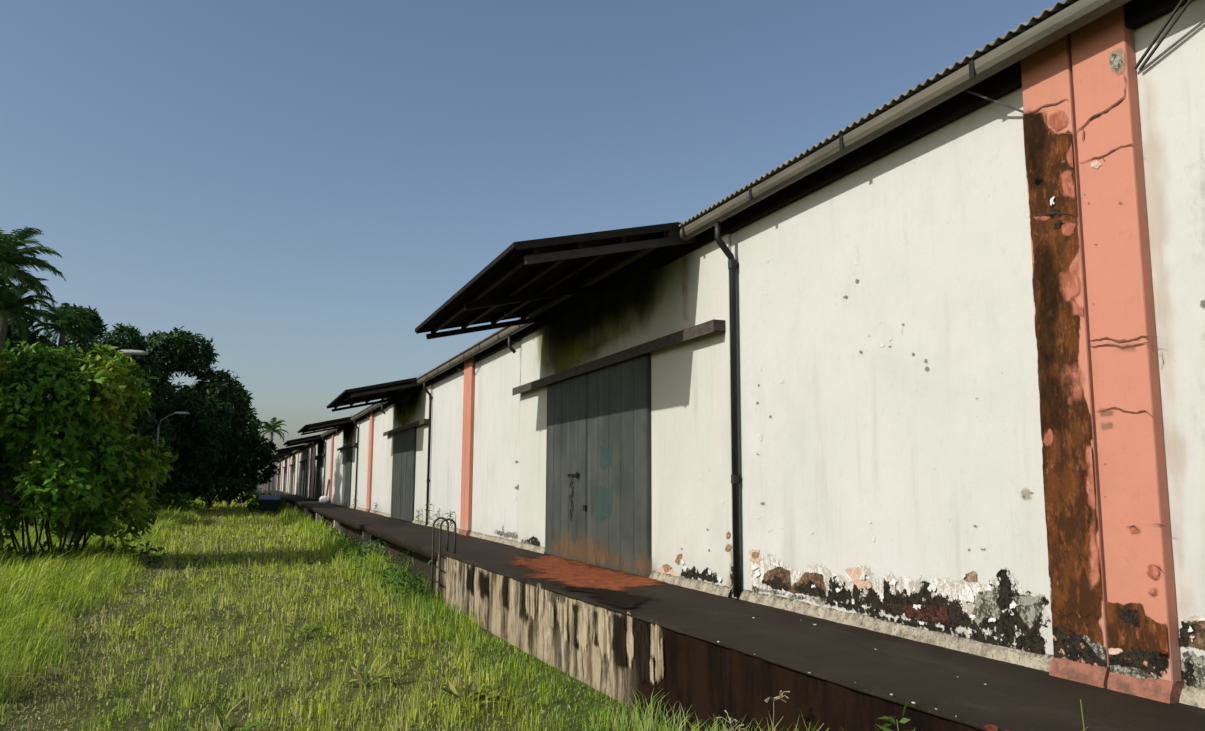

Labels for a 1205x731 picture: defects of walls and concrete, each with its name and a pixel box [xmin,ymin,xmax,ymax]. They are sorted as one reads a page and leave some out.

crack [1022,83,1137,169]
rust [1023,110,1169,658]
crack [1090,336,1158,358]
damp [466,526,664,688]
peeling [654,548,685,576]
peeling [749,549,1049,651]
spalling [1178,615,1205,651]